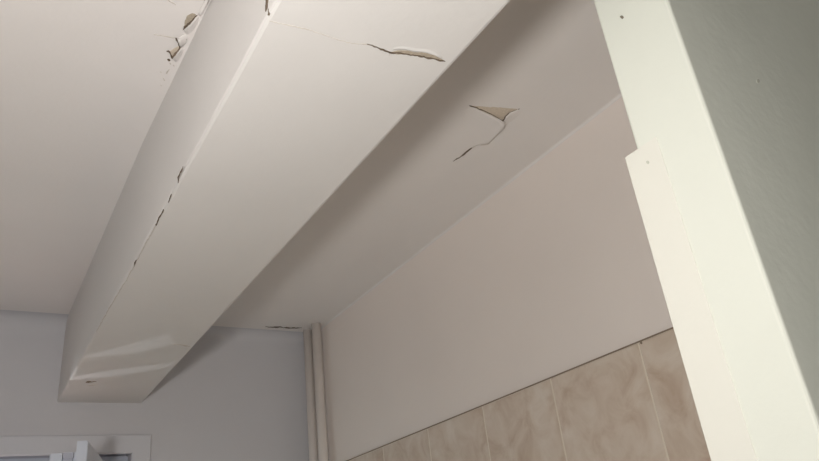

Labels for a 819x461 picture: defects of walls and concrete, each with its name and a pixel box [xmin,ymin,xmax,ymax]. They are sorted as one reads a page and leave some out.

crack [265,0,445,62]